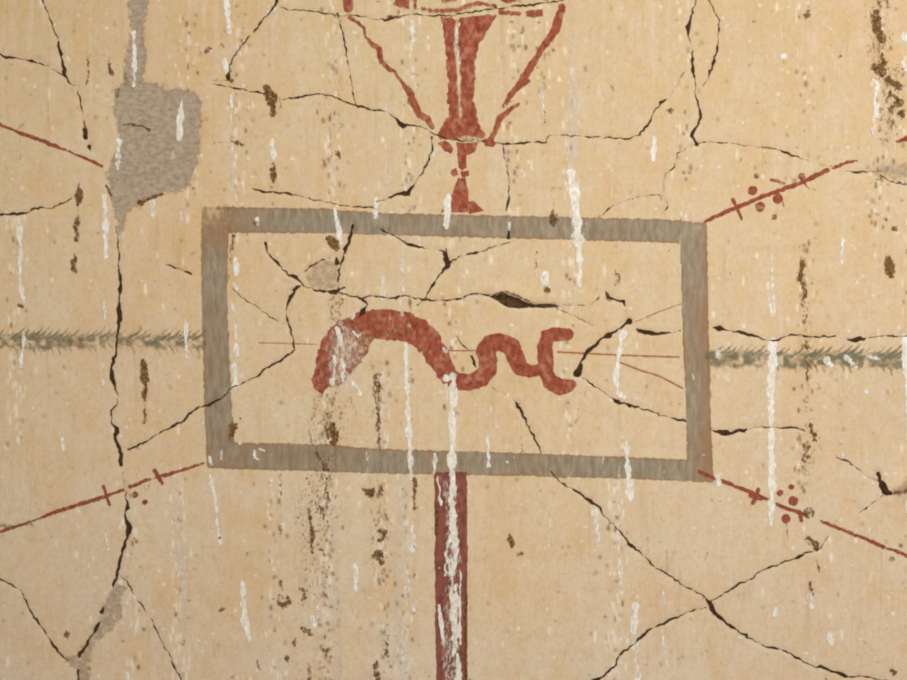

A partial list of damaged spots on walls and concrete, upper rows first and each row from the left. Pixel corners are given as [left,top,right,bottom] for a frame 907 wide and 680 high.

flaking render [105,0,202,233]
crack [110,0,666,466]
leakage [566,66,585,288]
crack [670,0,800,171]
rust [871,0,905,125]
rust [308,452,331,555]
rust [324,413,339,446]
rust [372,529,388,566]
leakage [432,373,458,495]
crack [554,293,686,422]
crack [515,402,892,680]
leakage [766,337,778,527]